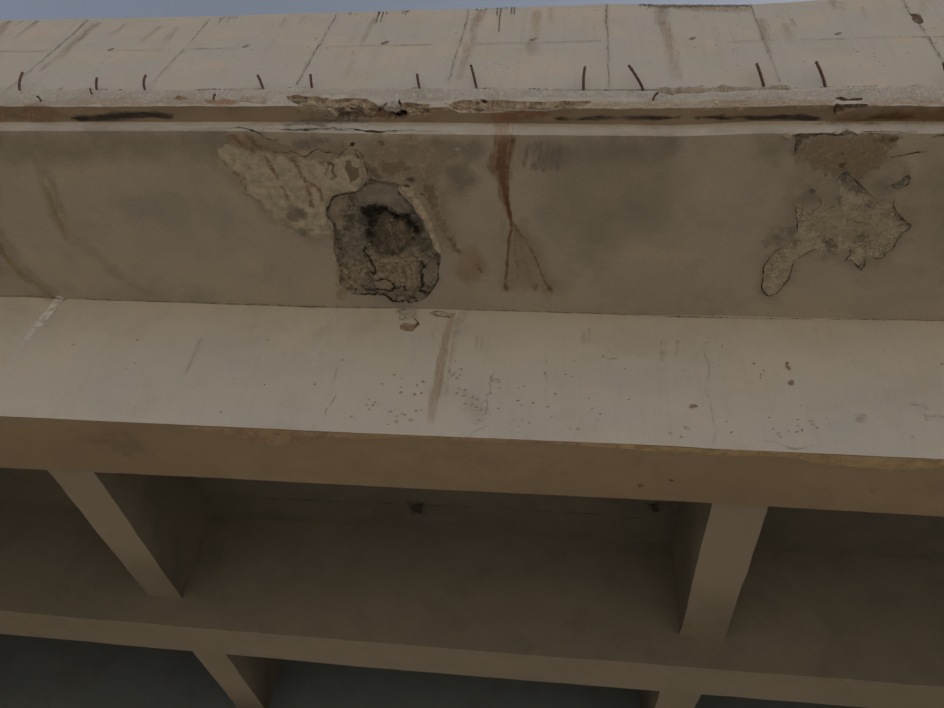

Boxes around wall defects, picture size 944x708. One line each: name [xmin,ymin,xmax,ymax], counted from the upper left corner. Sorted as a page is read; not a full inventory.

leakage [73,112,172,121]
spalling [286,74,431,120]
spalling [444,61,944,114]
spalling [783,128,917,154]
rust [490,138,551,290]